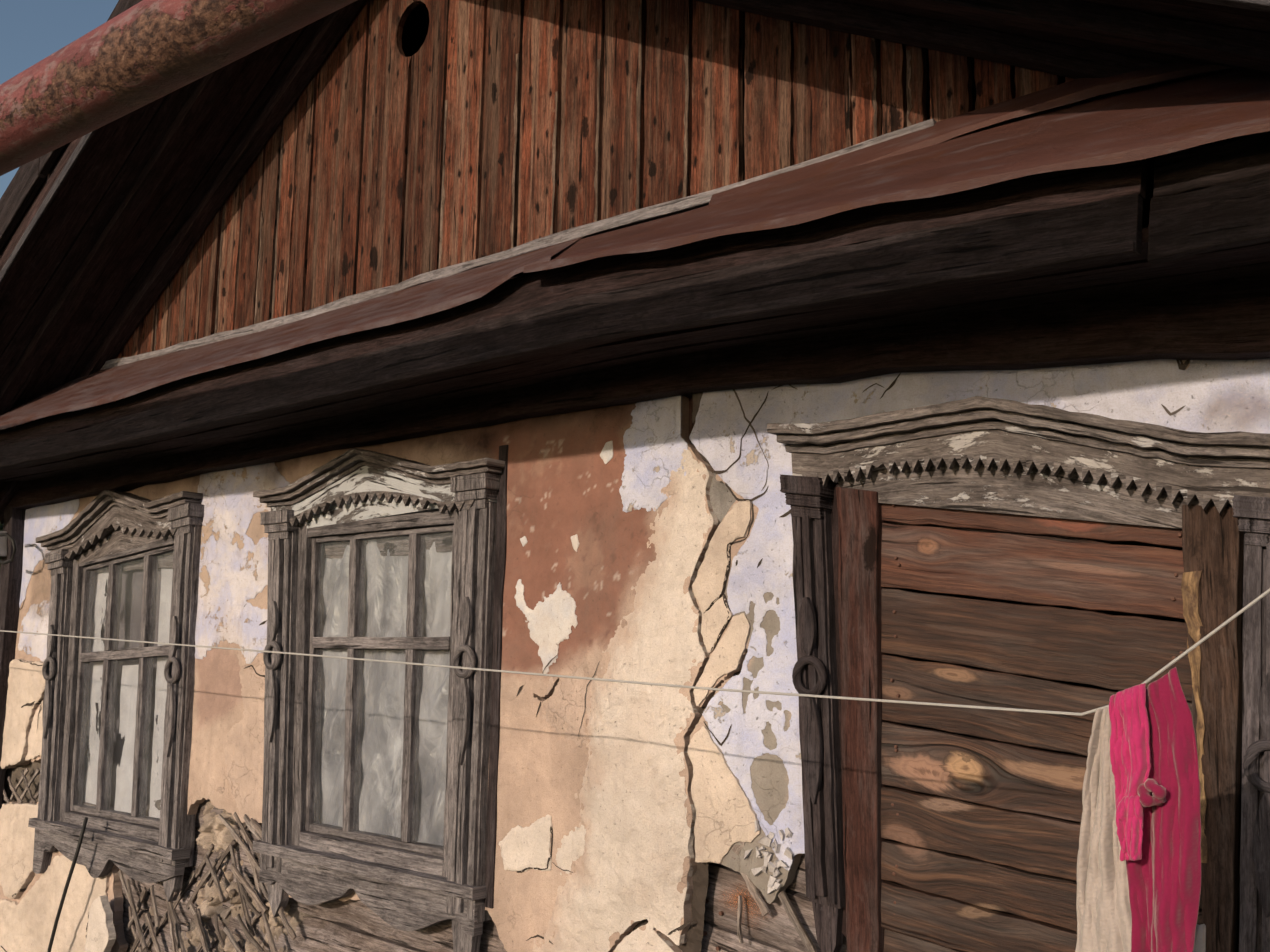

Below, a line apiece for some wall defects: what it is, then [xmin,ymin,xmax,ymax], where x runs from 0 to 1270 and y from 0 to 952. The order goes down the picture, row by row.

peeling [18,499,80,661]
peeling [195,462,290,824]
peeling [514,579,592,747]
peeling [571,534,580,552]
crack [689,671,741,746]
crack [689,385,797,651]
peeling [600,358,1270,871]
crack [627,862,709,952]